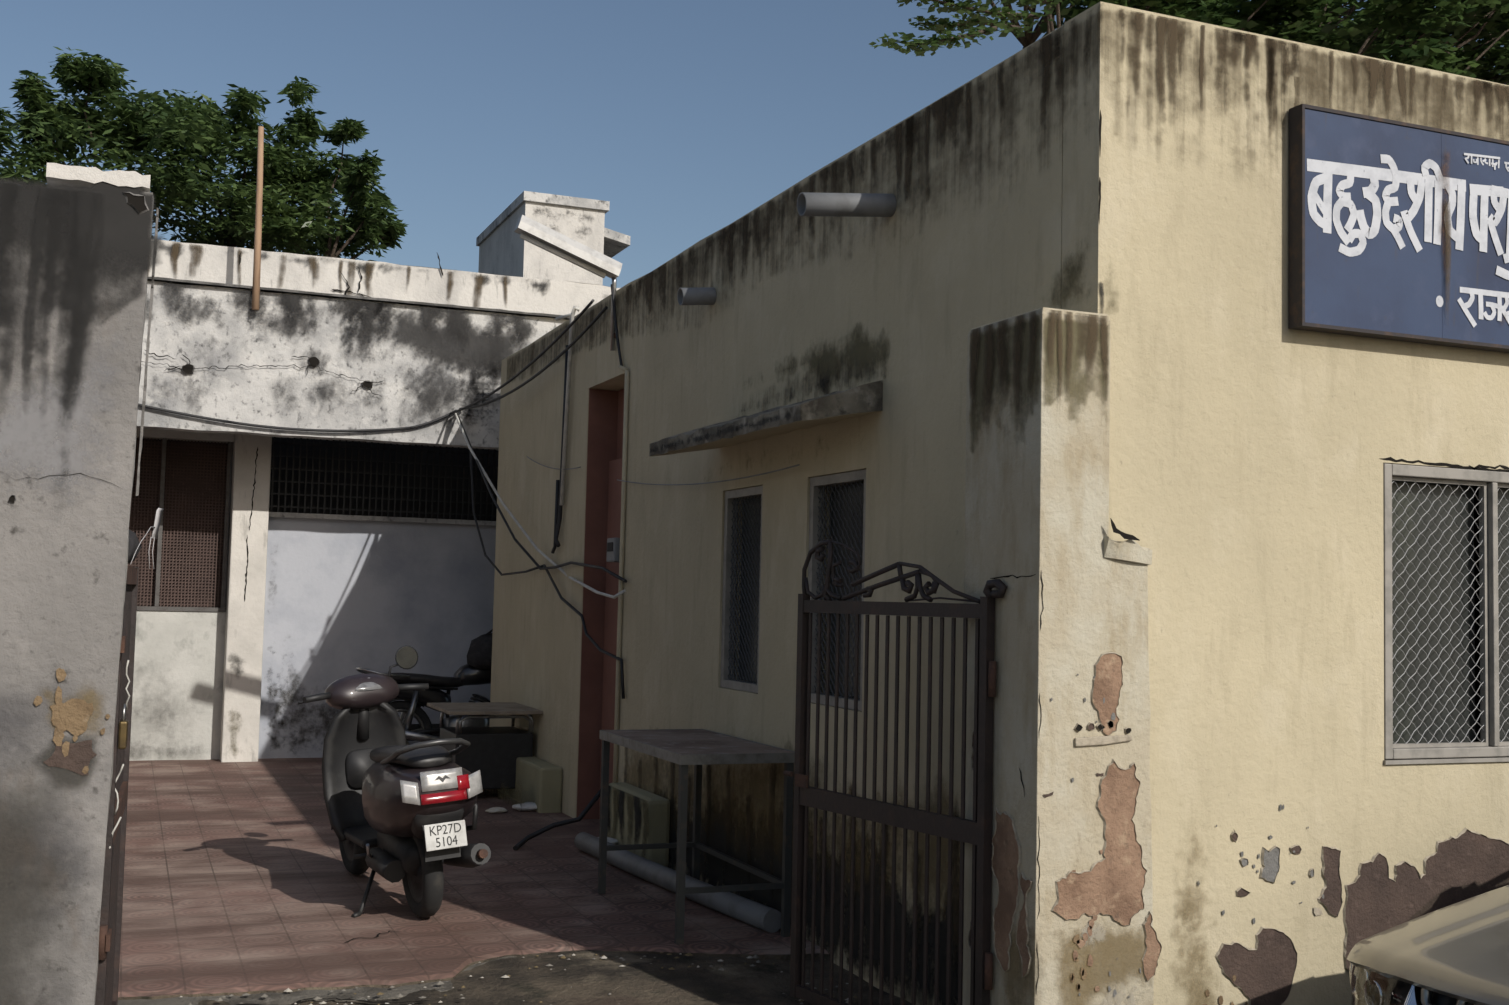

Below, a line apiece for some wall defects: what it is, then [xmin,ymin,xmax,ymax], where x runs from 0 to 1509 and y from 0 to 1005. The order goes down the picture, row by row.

water stain [0,178,218,390]
water stain [236,9,1509,452]
spalling [33,668,110,785]
water stain [0,806,43,1005]
peeling [991,807,1033,978]
water stain [1062,925,1144,1005]
peeling [1051,652,1162,999]
peeling [1203,918,1297,1005]
peeling [1216,825,1509,972]